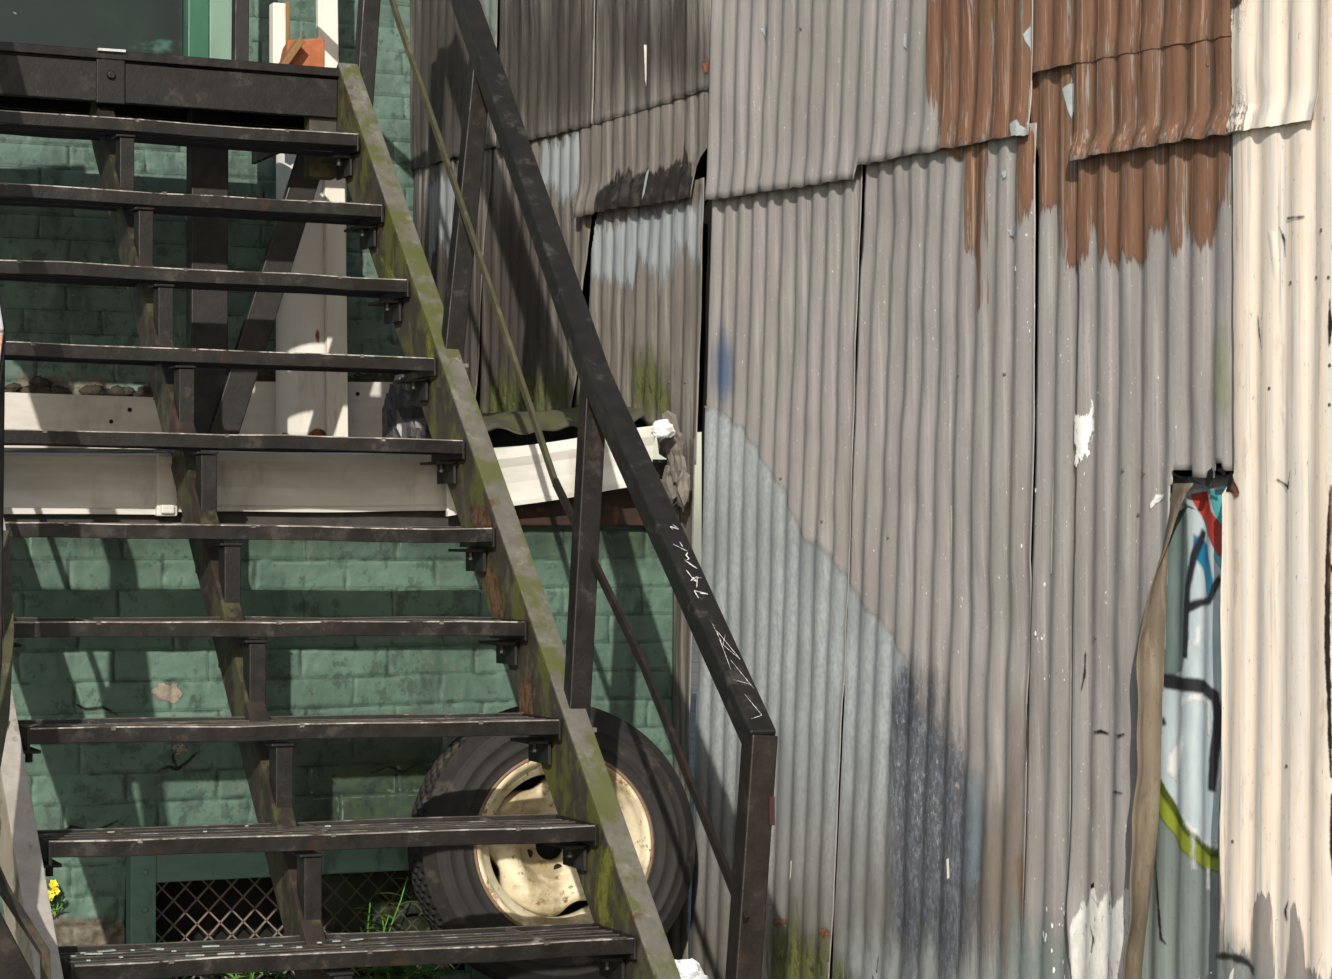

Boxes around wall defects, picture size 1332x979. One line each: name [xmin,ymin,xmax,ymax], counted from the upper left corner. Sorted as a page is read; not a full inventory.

leakage [500,0,707,140]
leakage [594,147,692,212]
spalling [150,682,183,703]
crack [1324,491,1332,861]
peeling [1070,877,1130,979]